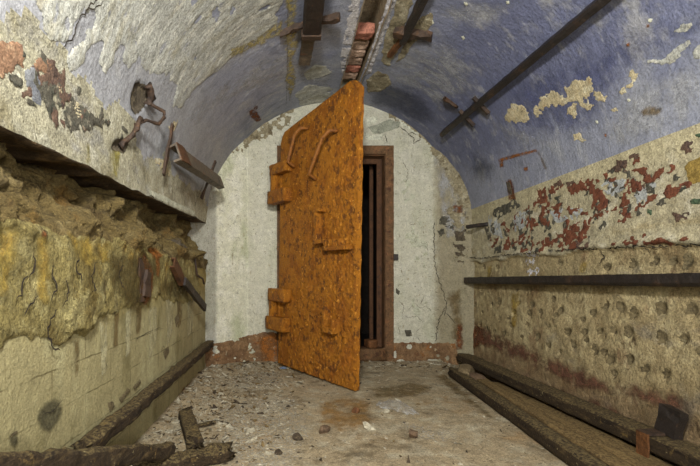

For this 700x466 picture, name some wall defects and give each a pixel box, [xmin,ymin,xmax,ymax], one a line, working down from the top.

crack [64,0,105,47]
peeling [0,0,283,133]
peeling [232,65,336,153]
peeling [340,0,360,74]
peeling [504,76,607,124]
peeling [647,23,700,65]
peeling [485,133,700,265]
crack [16,253,97,316]
spalling [0,142,208,349]
crack [397,205,455,341]
leakage [473,324,484,348]
leakage [38,401,61,430]